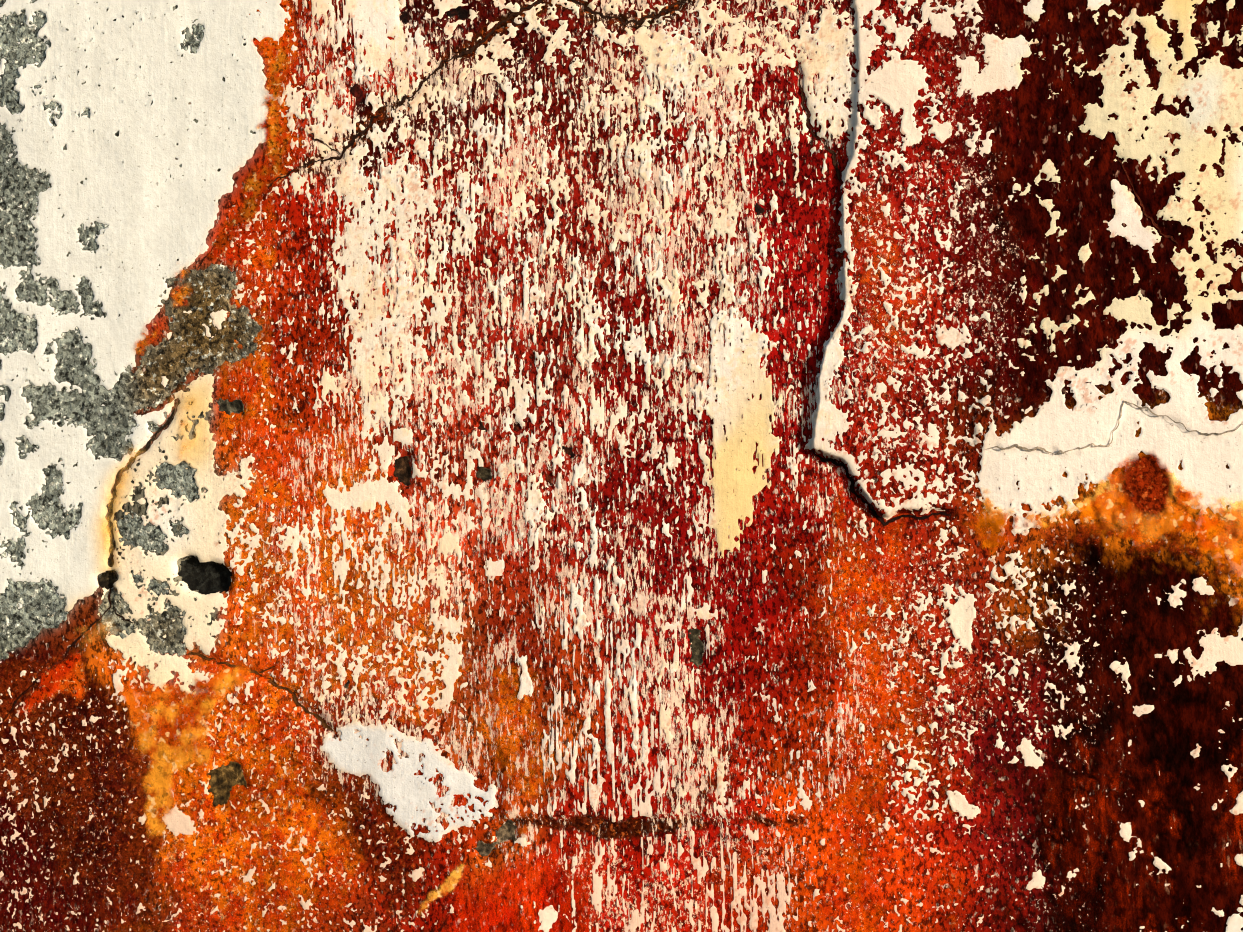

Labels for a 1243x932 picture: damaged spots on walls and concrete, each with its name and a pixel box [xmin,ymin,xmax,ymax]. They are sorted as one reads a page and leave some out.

crack [239,0,687,212]
crack [795,60,841,183]
corrosion [858,193,919,342]
peeling [1001,159,1067,242]
peeling [1103,179,1162,275]
corrosion [124,0,465,932]
crack [812,451,954,526]
corrosion [970,454,1243,586]
corrosion [25,655,85,711]
peeling [1148,574,1243,690]
peeling [0,688,117,932]
peeling [1118,822,1171,886]